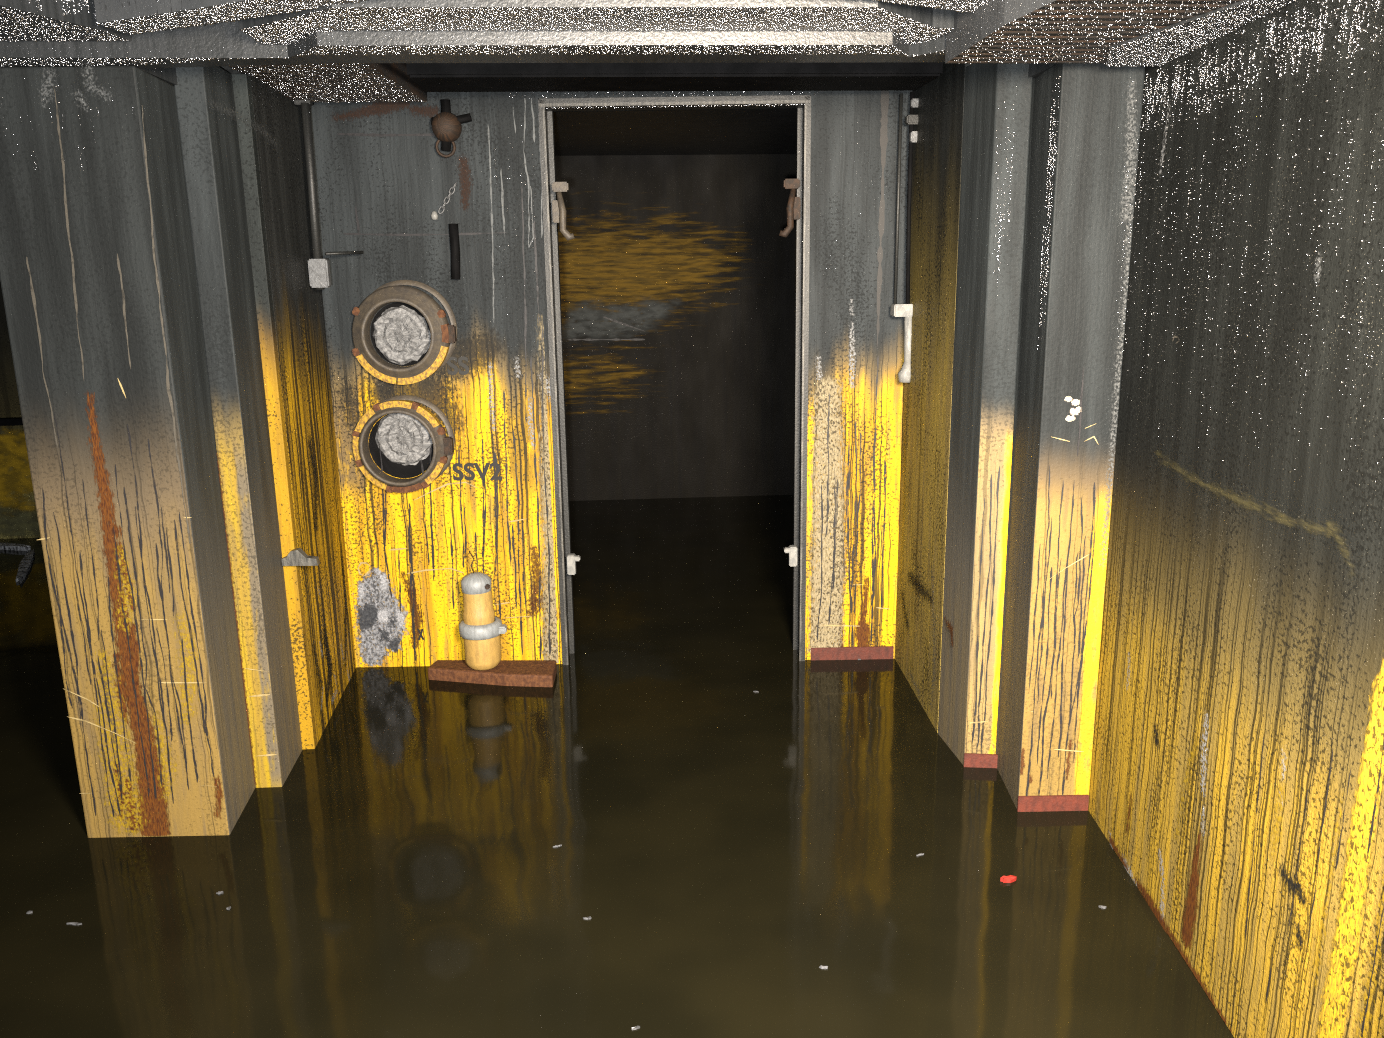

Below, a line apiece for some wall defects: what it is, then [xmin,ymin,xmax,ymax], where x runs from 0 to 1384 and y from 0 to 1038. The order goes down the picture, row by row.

rust [86,393,171,836]
flaking render [321,567,409,709]
rust [214,775,223,817]